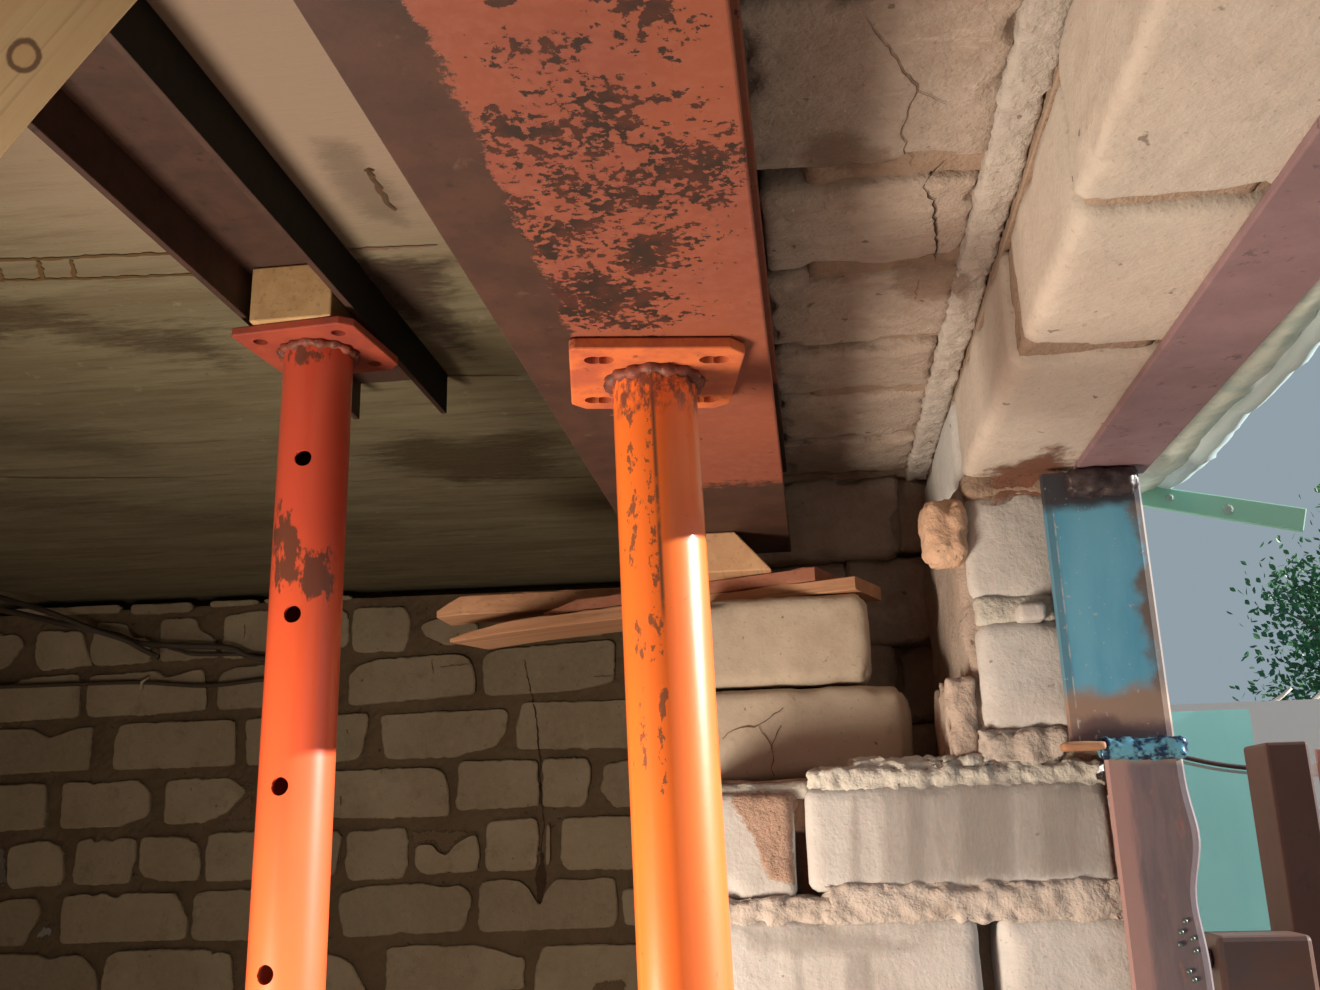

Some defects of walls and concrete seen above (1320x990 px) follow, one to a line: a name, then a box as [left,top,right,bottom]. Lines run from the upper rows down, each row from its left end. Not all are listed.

crack [866,17,945,261]
crack [524,660,547,904]
crack [723,708,783,780]